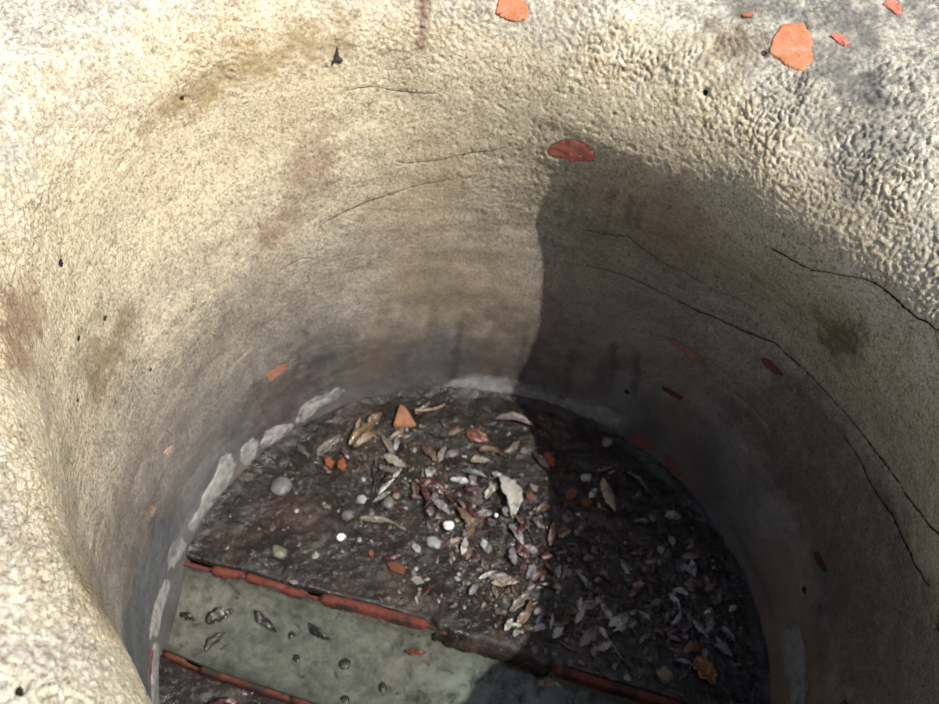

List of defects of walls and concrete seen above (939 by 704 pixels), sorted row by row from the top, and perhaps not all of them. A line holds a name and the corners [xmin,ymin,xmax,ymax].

crack [557,229,939,588]